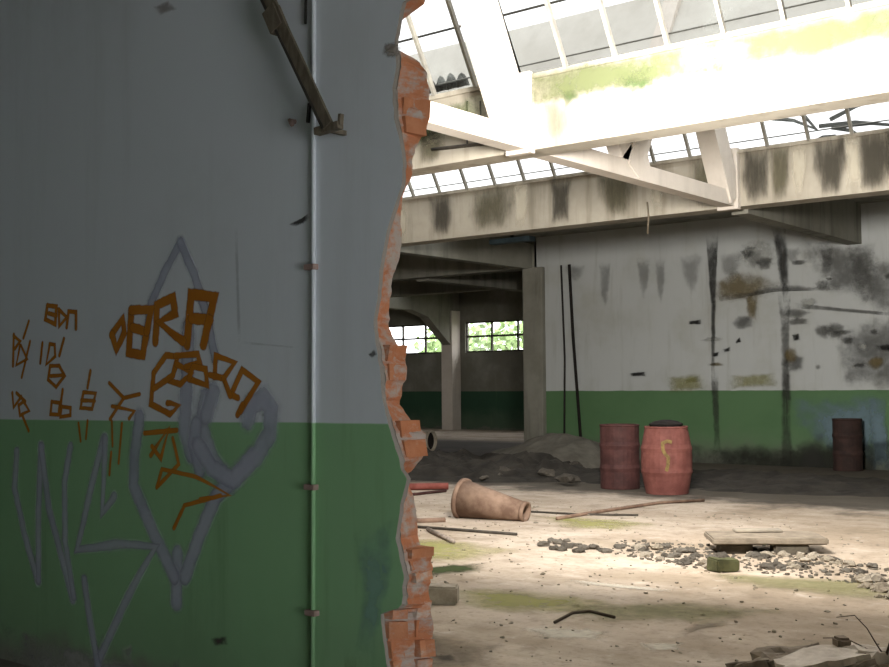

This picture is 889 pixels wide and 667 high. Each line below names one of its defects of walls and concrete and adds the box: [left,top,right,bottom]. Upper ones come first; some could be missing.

damp [421,131,441,159]
damp [695,166,708,183]
damp [435,198,449,230]
damp [476,189,526,226]
damp [552,181,569,219]
damp [601,178,628,210]
damp [775,235,788,290]
damp [707,247,717,360]
spalling [369,0,436,667]
damp [743,376,768,385]